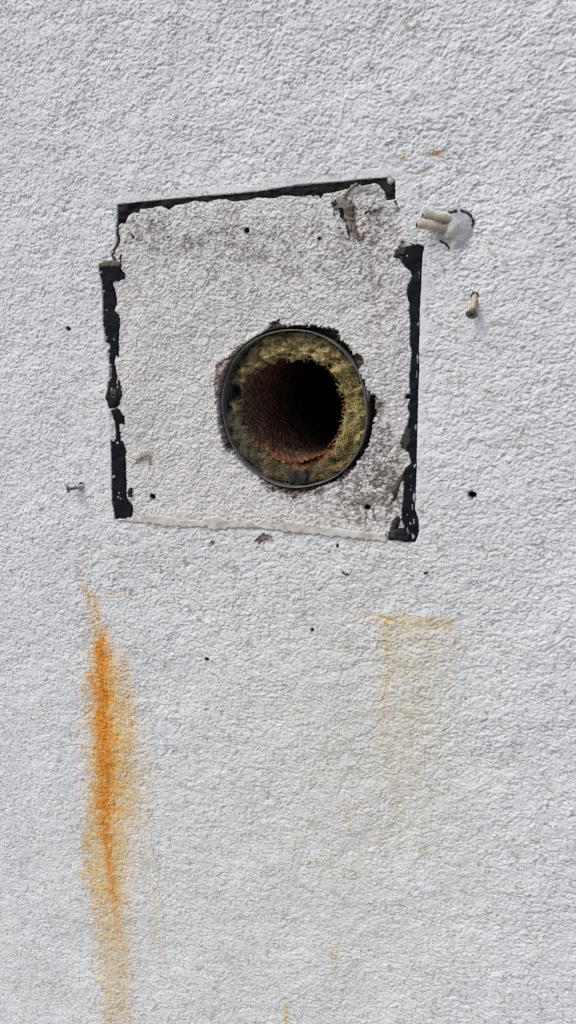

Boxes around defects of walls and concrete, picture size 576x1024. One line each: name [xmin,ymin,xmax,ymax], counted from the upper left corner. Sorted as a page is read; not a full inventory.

peeling [331,183,399,242]
rust [66,534,169,1024]